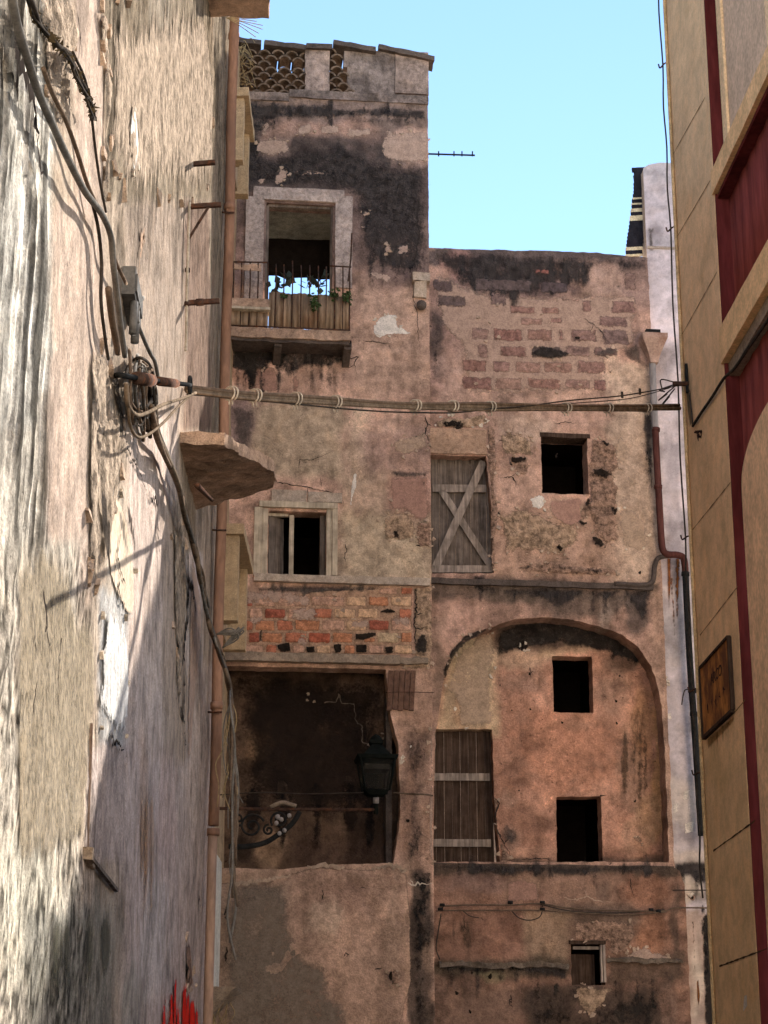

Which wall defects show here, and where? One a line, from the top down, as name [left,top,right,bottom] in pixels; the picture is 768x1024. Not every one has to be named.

water stain [249,100,425,281]
water stain [437,253,593,306]
water stain [618,260,643,268]
peeling [372,313,410,338]
water stain [233,353,342,392]
spalling [391,414,624,576]
spalling [377,509,436,548]
water stain [473,575,650,619]
water stain [497,623,639,663]
water stain [414,873,431,1017]
flaking render [570,918,671,959]